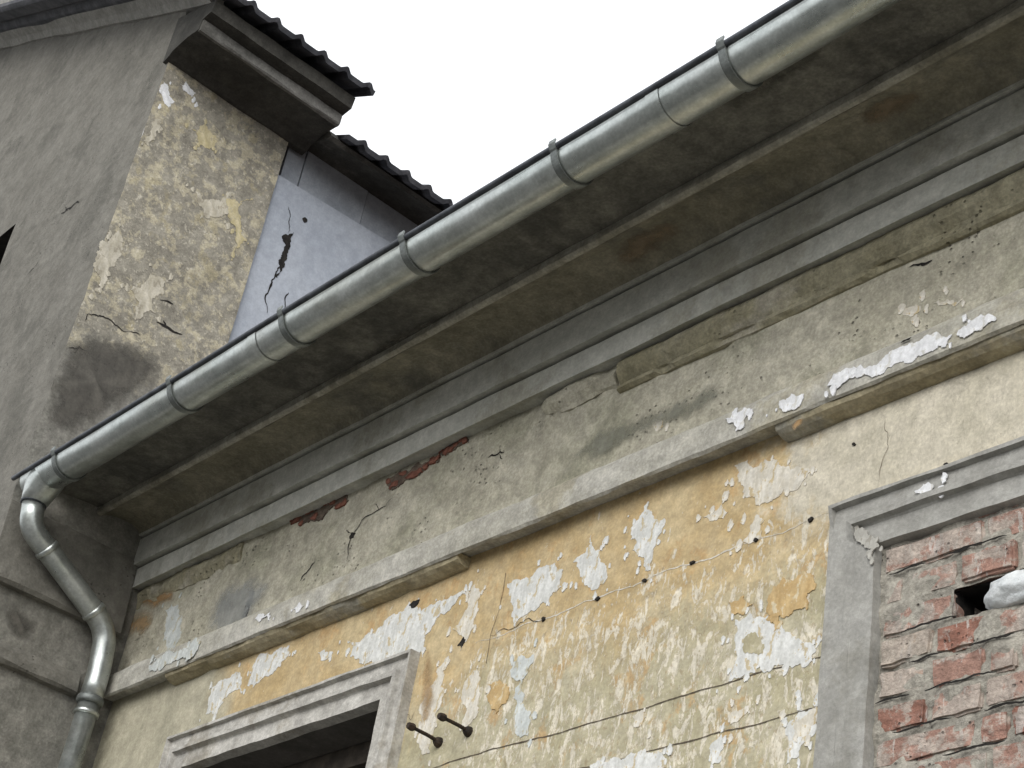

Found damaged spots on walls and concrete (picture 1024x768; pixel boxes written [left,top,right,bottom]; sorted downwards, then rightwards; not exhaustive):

leakage [53,341,155,427]
crack [85,300,181,335]
crack [264,266,289,312]
peeling [726,394,804,431]
peeling [824,286,997,398]
peeling [499,535,611,627]
peeling [623,501,666,583]
peeling [696,455,817,556]
spalling [955,579,997,618]
peeling [199,645,297,722]
peeling [318,569,491,766]
peeling [709,599,822,768]